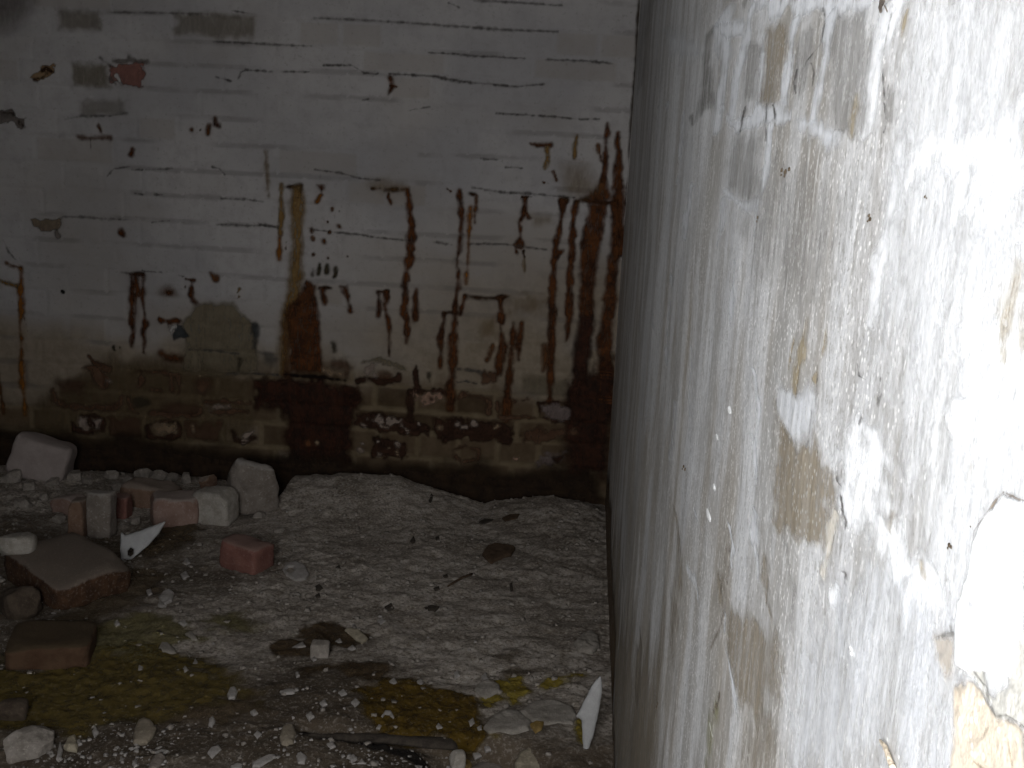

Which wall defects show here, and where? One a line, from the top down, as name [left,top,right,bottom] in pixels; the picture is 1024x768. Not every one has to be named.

rust [0,262,27,416]
rust [128,271,149,353]
rust [254,162,362,464]
rust [371,187,419,356]
rust [436,188,524,423]
rust [514,196,531,271]
rust [530,143,557,184]
rust [541,123,626,479]
leakage [0,430,21,465]
leakage [39,303,660,768]
peeling [935,496,1024,768]